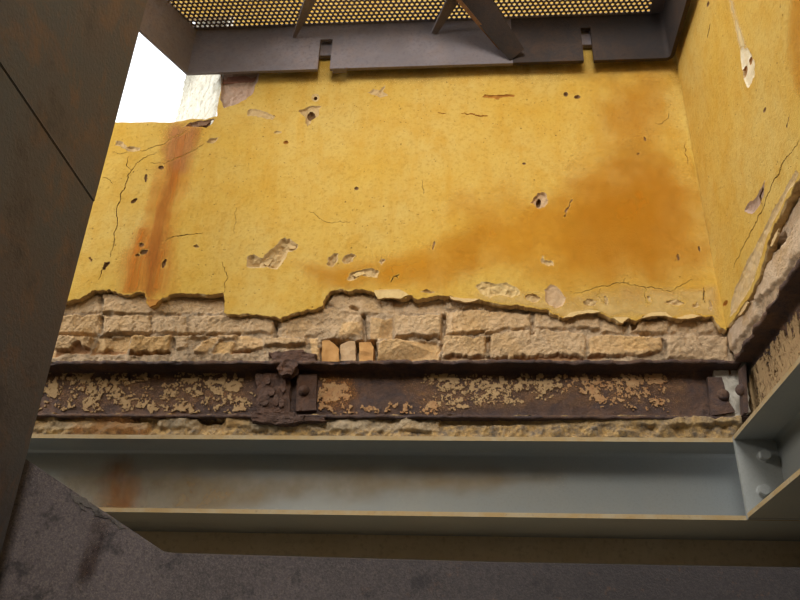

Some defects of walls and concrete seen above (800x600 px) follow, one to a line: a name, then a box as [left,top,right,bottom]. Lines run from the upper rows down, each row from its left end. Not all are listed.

flaking render [220,73,259,108]
flaking render [299,106,321,126]
crack [100,130,202,277]
crack [734,143,798,265]
flaking render [225,170,800,333]
flaking render [67,290,225,309]
water stain [493,290,714,316]
crack [574,278,705,304]